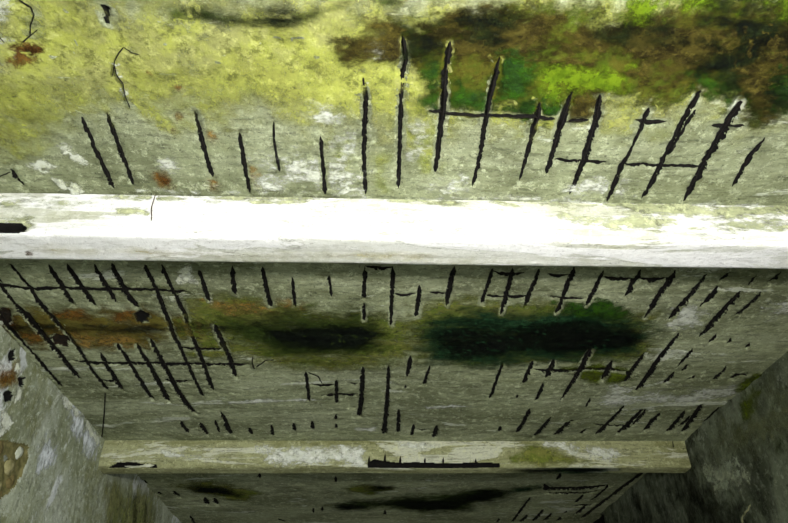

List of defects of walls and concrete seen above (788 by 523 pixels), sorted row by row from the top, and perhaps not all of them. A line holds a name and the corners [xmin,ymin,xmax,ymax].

water stain [172,7,243,22]
water stain [254,9,315,28]
corrosion [6,42,43,69]
corrosion [2,304,241,351]
water stain [175,293,736,405]
corrosion [0,361,19,388]
spalling [0,263,245,500]
water stain [337,484,542,513]
crack [581,473,643,518]